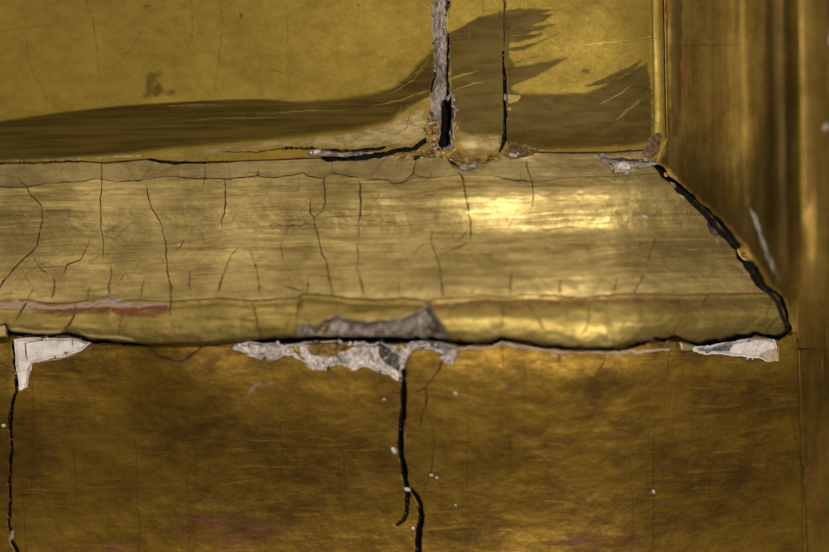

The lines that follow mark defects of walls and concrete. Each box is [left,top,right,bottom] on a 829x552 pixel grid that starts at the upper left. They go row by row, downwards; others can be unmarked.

crack [0,0,792,392]
spalling [595,153,657,174]
spalling [14,336,91,391]
spalling [231,301,462,381]
spalling [691,336,779,362]
crack [6,301,225,552]
crack [391,360,443,552]